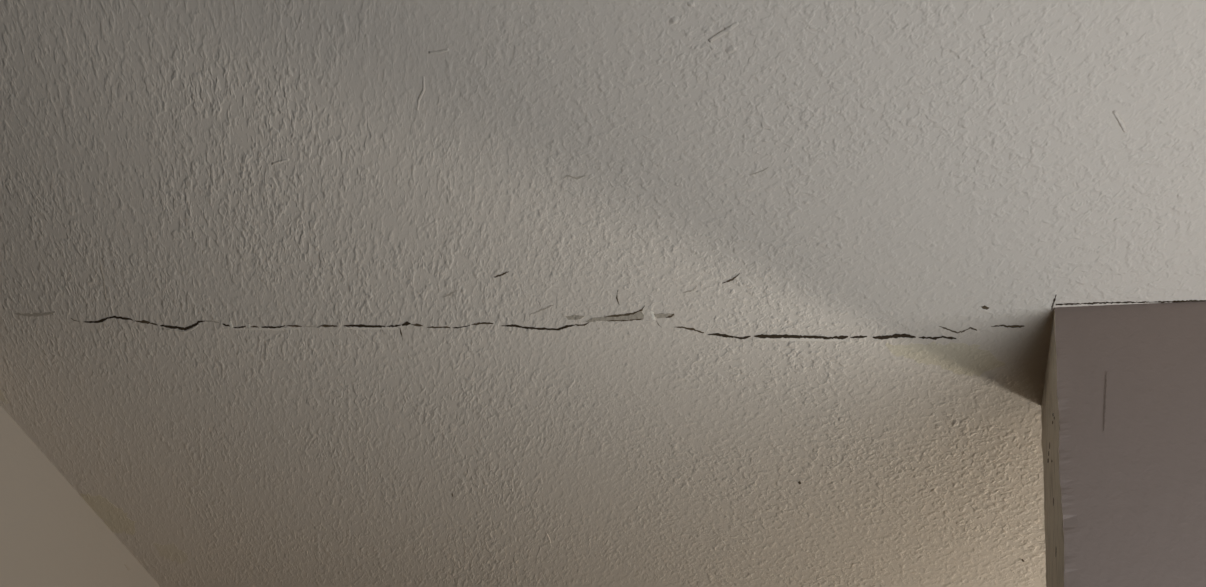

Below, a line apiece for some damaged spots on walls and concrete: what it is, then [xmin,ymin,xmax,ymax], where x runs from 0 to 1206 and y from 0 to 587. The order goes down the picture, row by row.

crack [14,262,1024,340]
crack [1051,295,1206,310]